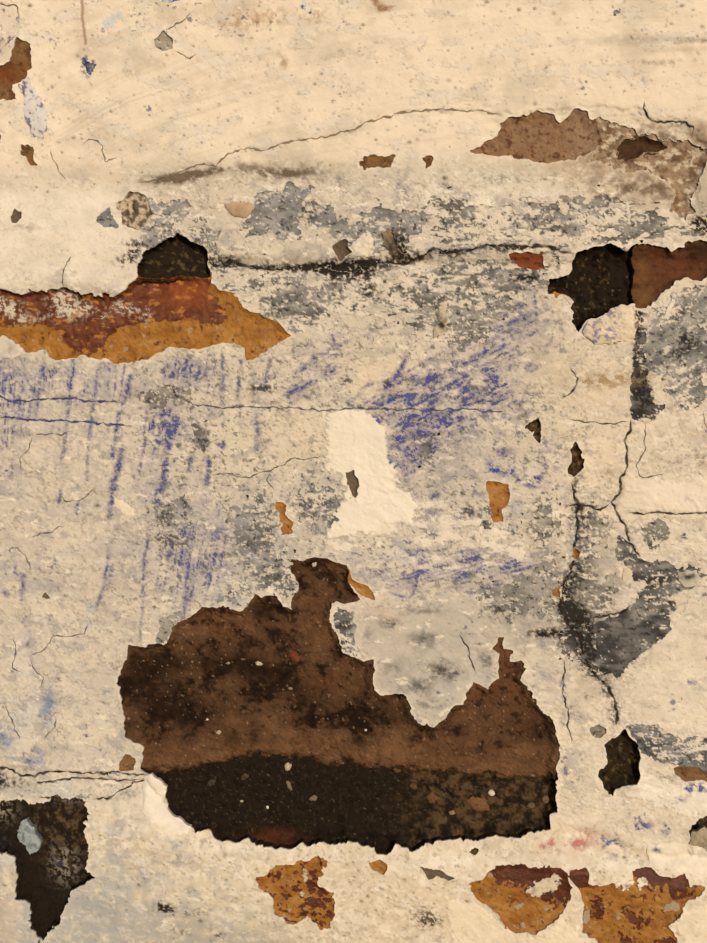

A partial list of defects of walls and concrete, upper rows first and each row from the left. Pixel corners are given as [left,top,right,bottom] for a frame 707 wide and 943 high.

peeling [0,38,48,166]
peeling [81,57,96,75]
crack [144,108,496,183]
crack [640,103,694,134]
peeling [0,109,707,422]
crack [558,419,707,742]
spalling [117,470,560,874]
crack [0,767,144,800]
peeling [590,724,707,794]
spalling [0,795,92,937]
peeling [256,856,335,930]
peeling [469,816,707,943]